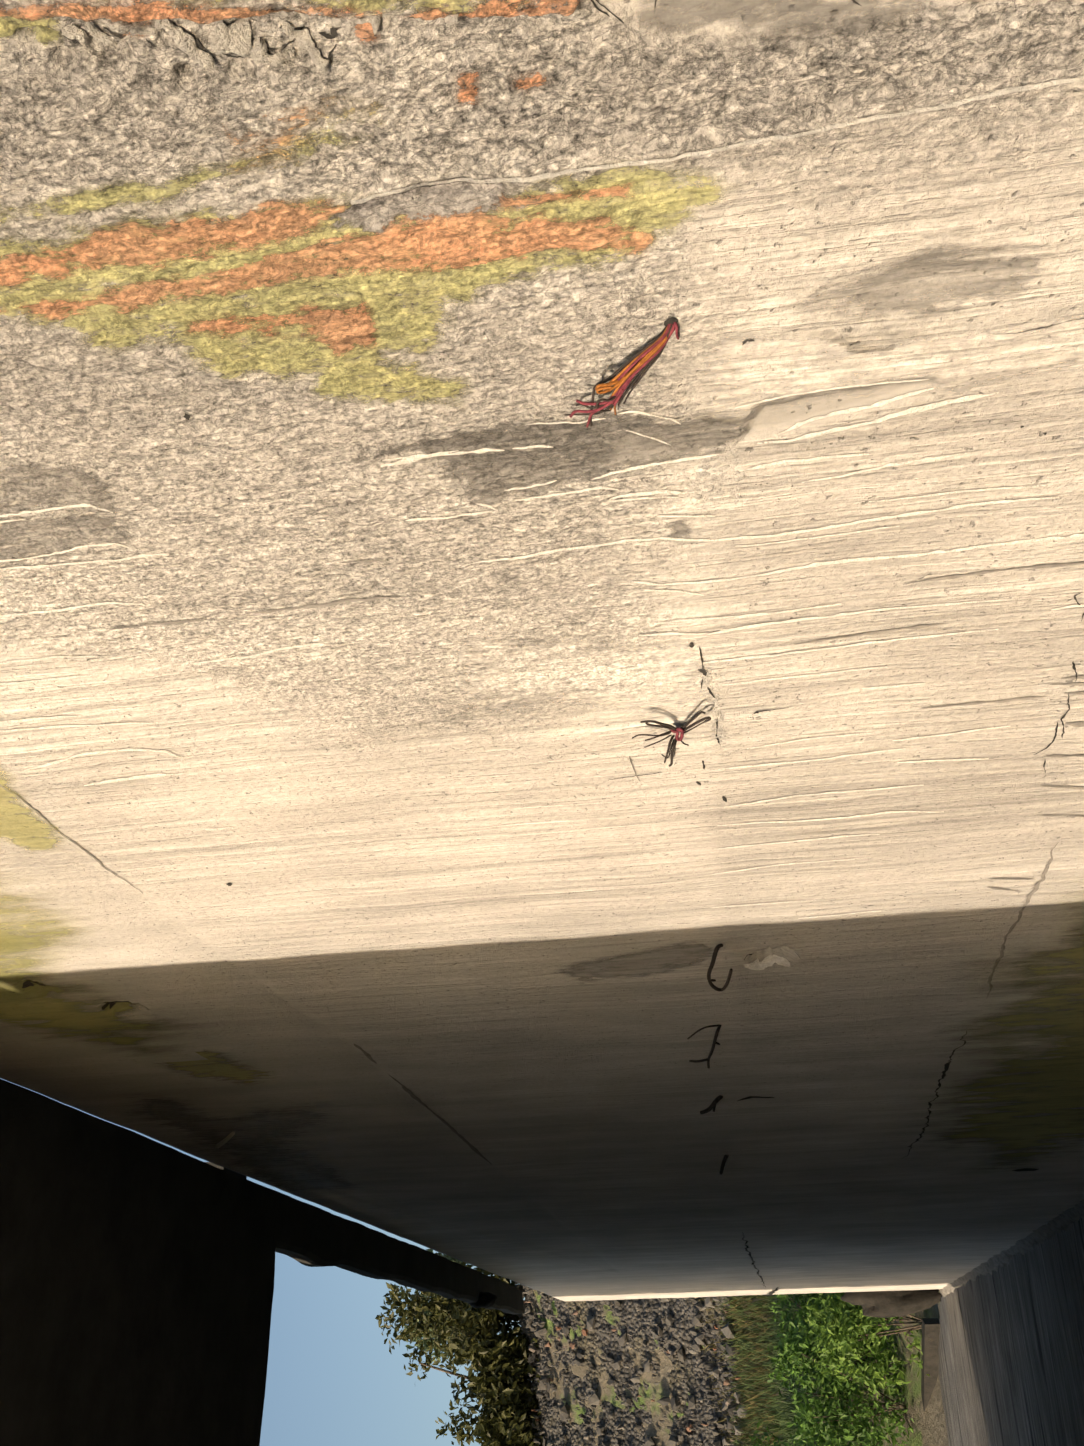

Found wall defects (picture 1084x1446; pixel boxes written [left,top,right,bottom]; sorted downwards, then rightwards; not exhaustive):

spalling [42,17,245,59]
rust [0,1,378,41]
spalling [232,9,363,63]
rust [412,0,579,20]
rust [0,166,720,403]
crack [1034,662,1077,773]
damp [0,897,159,1050]
crack [986,842,1059,999]
crack [902,1031,967,1159]